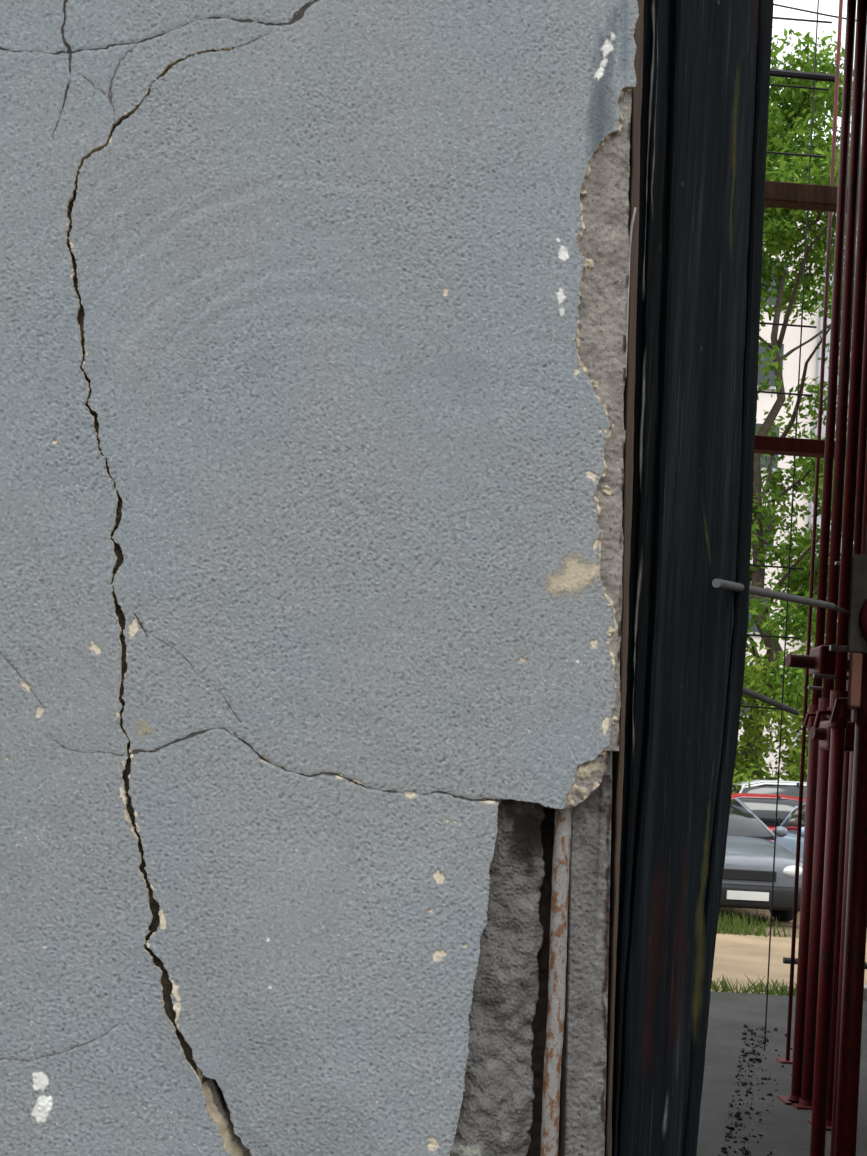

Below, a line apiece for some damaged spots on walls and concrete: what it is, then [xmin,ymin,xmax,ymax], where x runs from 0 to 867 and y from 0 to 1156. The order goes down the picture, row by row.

crack [0,0,501,1088]
spalling [572,88,632,751]
spalling [197,1068,252,1156]
spalling [427,775,612,1156]